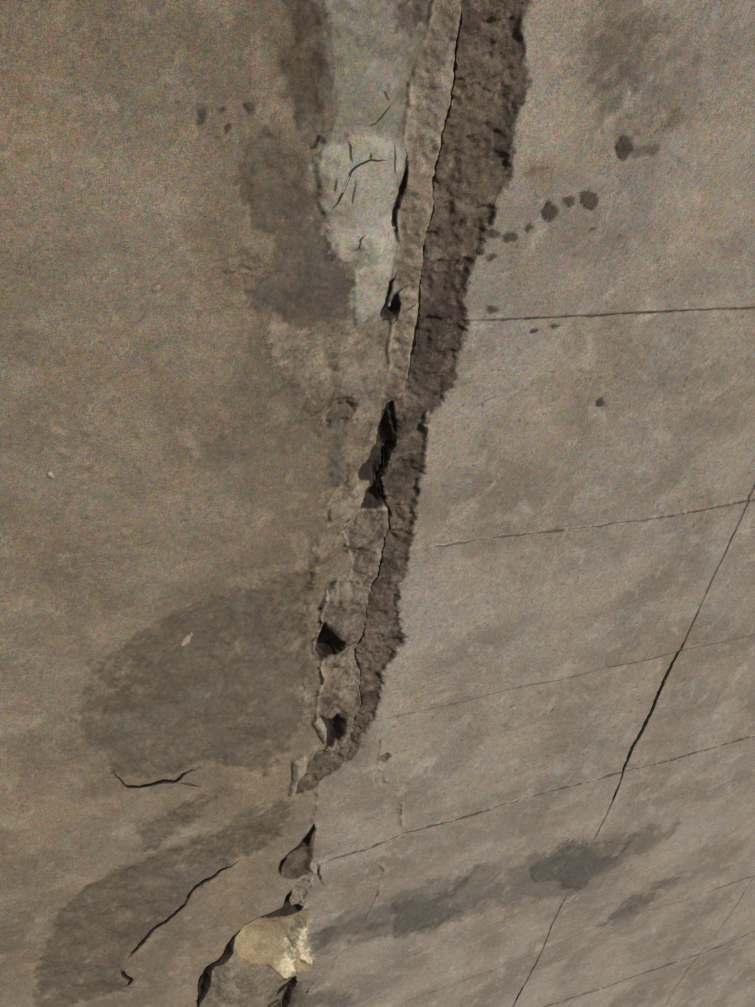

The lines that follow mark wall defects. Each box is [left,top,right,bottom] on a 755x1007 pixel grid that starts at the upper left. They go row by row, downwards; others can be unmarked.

crack [434,8,463,171]
crack [334,141,408,234]
damp [490,223,534,243]
damp [542,189,599,223]
spalling [33,0,531,1007]
crack [343,245,433,729]
crack [594,487,755,840]
crack [114,766,203,789]
crack [122,863,236,988]
damp [391,866,479,938]
crack [513,896,567,1007]
damp [530,836,637,891]